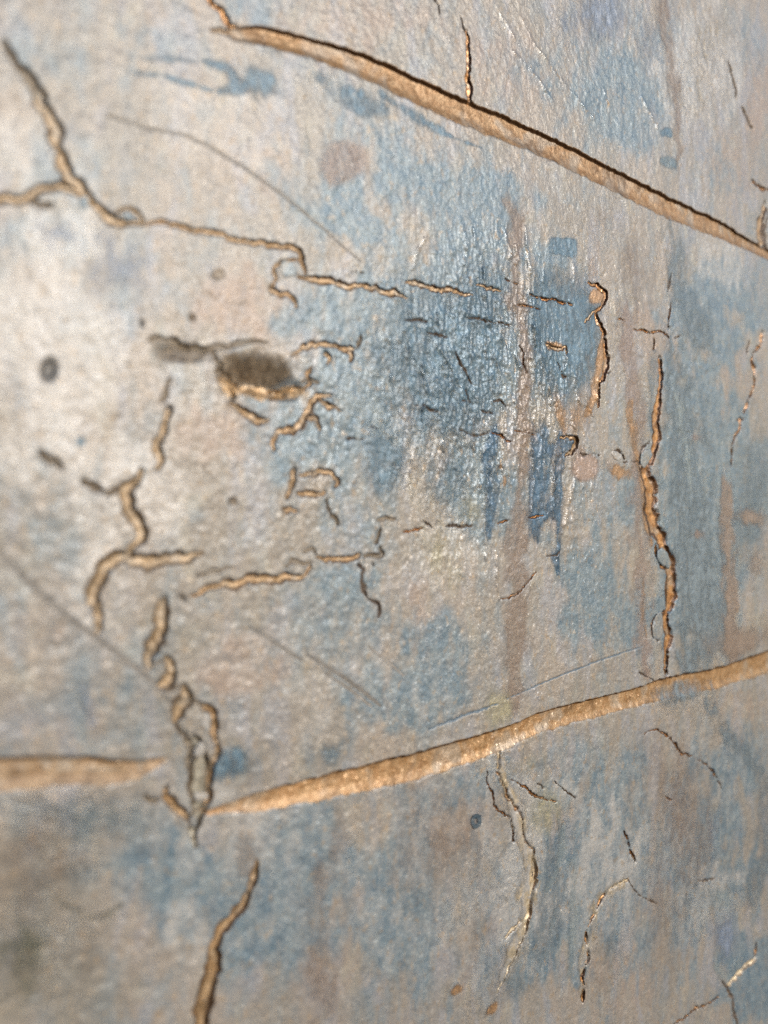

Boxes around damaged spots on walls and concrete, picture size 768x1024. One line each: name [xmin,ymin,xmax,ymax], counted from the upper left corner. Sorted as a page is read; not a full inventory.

crack [207,0,235,36]
crack [434,0,474,106]
crack [728,61,753,130]
crack [752,179,768,254]
crack [0,42,682,681]
crack [39,379,473,849]
crack [644,728,722,790]
crack [486,752,575,994]
crack [191,860,260,1024]